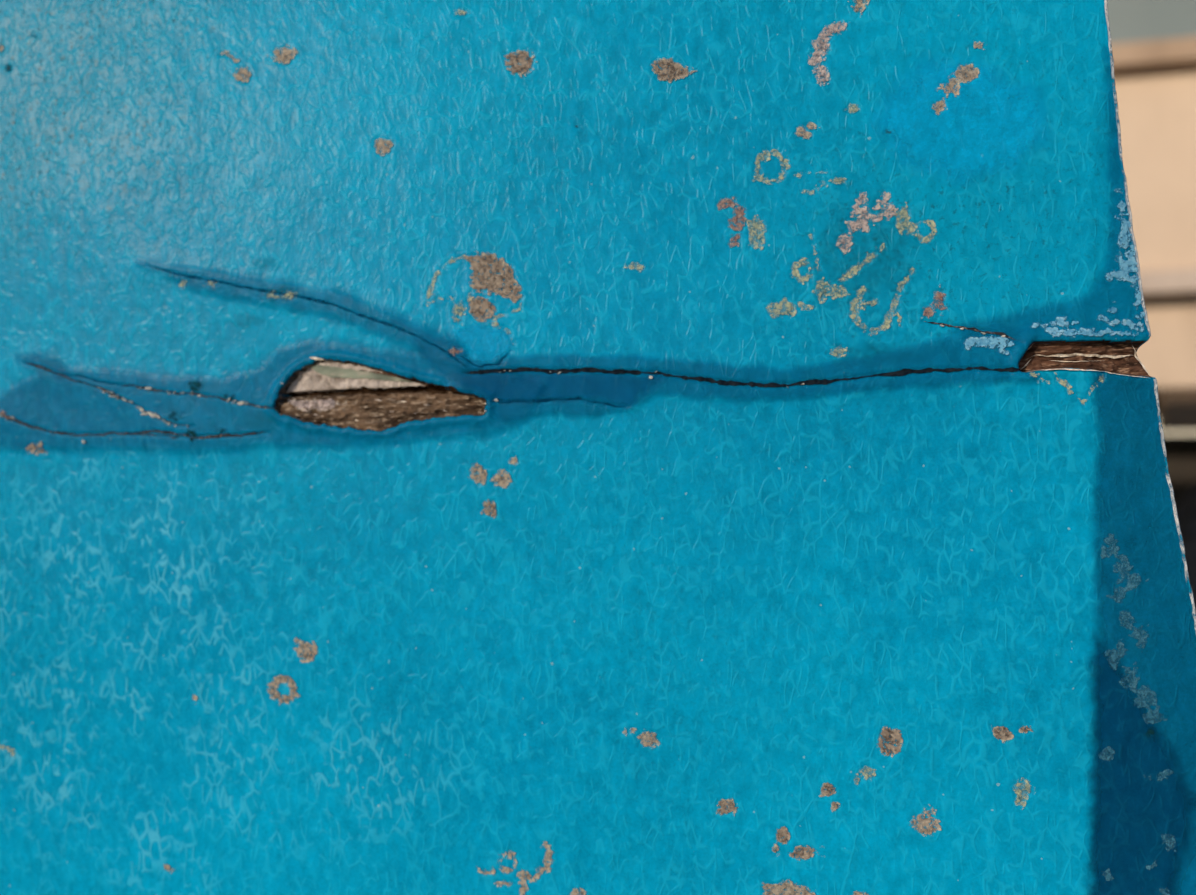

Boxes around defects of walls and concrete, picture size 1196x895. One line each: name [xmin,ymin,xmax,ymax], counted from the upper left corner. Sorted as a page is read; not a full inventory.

peeling [808,0,869,86]
peeling [932,64,979,115]
peeling [836,192,937,253]
peeling [426,252,522,333]
peeling [766,234,914,334]
crack [0,363,269,443]
spalling [274,357,486,431]
crack [152,266,1020,407]
spalling [1018,340,1150,404]
peeling [470,457,518,517]
peeling [476,841,553,895]
peeling [772,826,816,860]